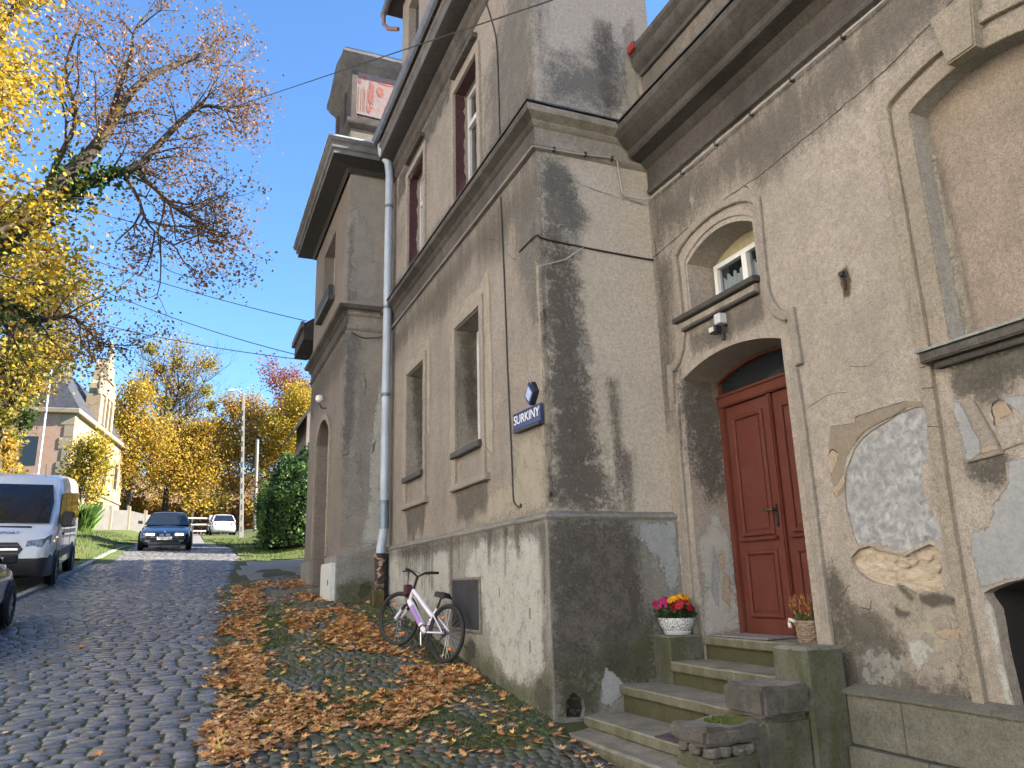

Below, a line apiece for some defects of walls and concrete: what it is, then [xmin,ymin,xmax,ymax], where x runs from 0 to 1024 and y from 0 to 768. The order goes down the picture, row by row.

damp [484,0,626,152]
damp [393,151,655,683]
flaking render [991,395,1024,426]
flaking render [696,513,740,635]
flaking render [827,401,967,678]
flaking render [970,458,1024,705]
peeling [535,668,624,717]